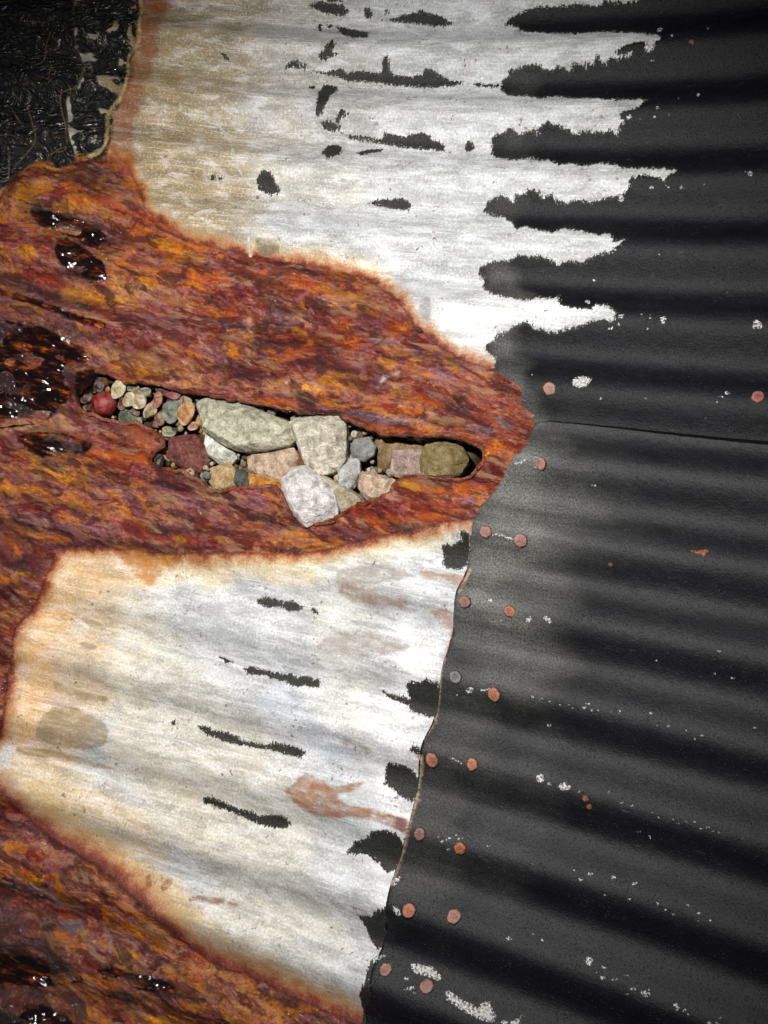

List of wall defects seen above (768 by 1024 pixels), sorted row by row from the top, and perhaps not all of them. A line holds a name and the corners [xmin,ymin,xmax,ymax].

damp [31,209,111,281]
rust [0,0,535,748]
peeling [308,0,768,441]
rust [0,773,364,1024]